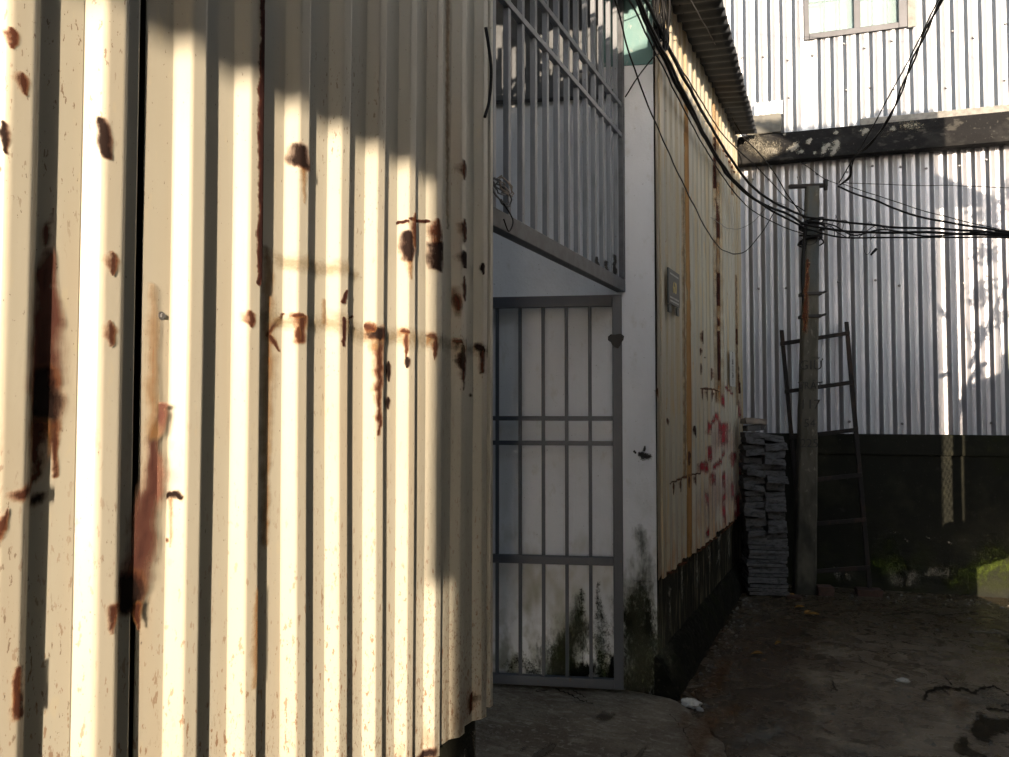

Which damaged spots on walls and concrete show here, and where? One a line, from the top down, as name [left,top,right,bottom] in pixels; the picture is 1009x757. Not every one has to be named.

rust [396,0,467,315]
rust [0,208,64,539]
rust [105,320,115,347]
rust [106,251,118,276]
rust [244,0,310,544]
rust [364,323,391,435]
rust [399,328,410,368]
rust [659,103,740,580]
rust [108,293,183,634]
rust [12,666,24,720]
damp [623,531,669,695]
crack [923,676,1009,713]